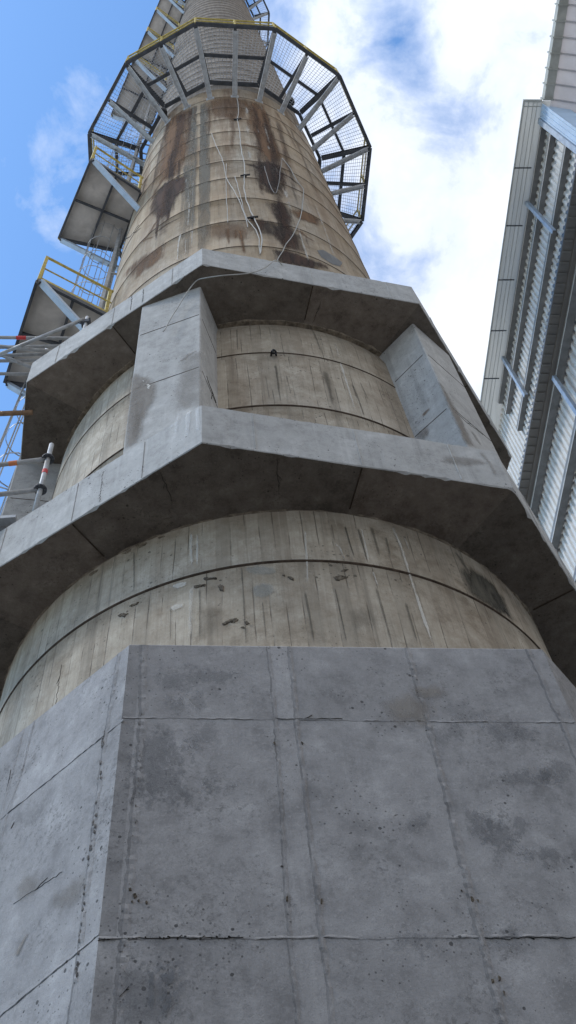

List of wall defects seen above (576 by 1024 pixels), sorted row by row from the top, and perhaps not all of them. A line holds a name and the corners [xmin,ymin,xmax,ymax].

corrosion [126,109,192,277]
corrosion [211,99,328,268]
water stain [463,570,511,617]